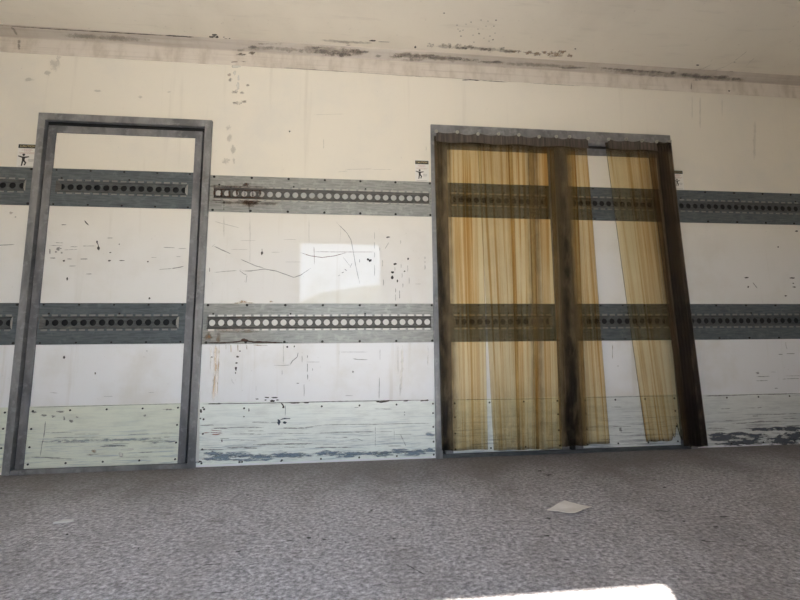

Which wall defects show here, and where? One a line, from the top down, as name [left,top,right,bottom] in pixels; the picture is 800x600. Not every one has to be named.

corrosion [211,183,275,210]